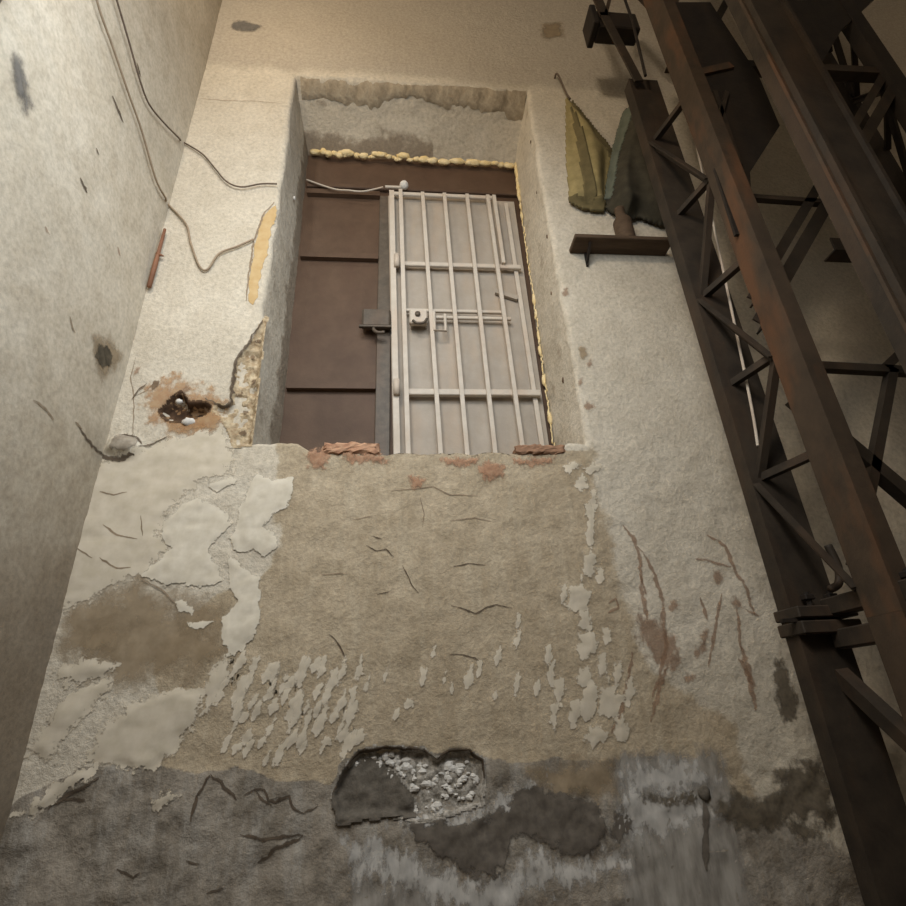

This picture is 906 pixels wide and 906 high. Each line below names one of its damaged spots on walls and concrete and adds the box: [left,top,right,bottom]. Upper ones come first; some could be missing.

flaking render [440,456,552,481]
water stain [61,576,225,683]
peeling [10,316,487,826]
peeling [533,460,637,750]
rust [611,652,633,733]
rust [623,525,679,722]
rust [695,535,758,710]
crack [117,869,140,879]
crack [190,774,318,863]
water stain [340,758,837,906]